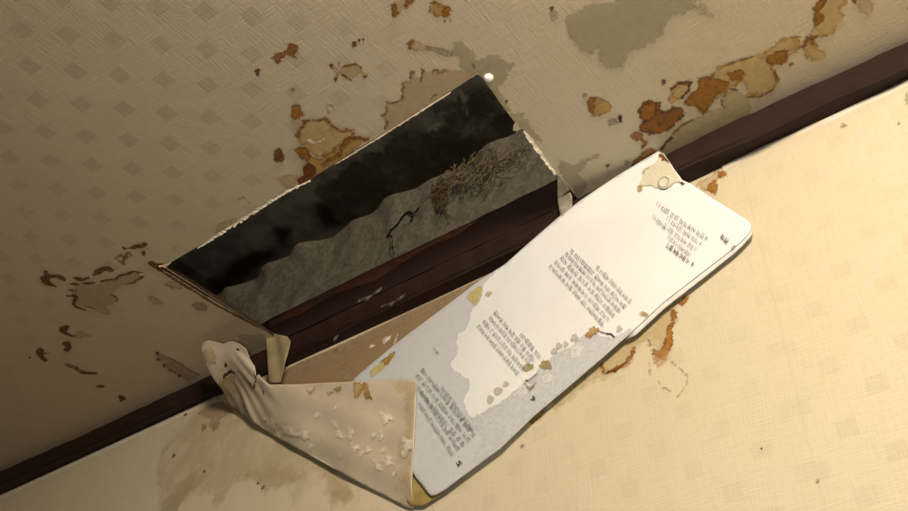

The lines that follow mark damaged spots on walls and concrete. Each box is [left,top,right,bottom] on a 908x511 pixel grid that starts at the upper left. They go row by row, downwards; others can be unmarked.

water stain [294,39,543,226]
crack [386,207,419,258]
peeling [280,277,484,385]
water stain [553,306,675,403]